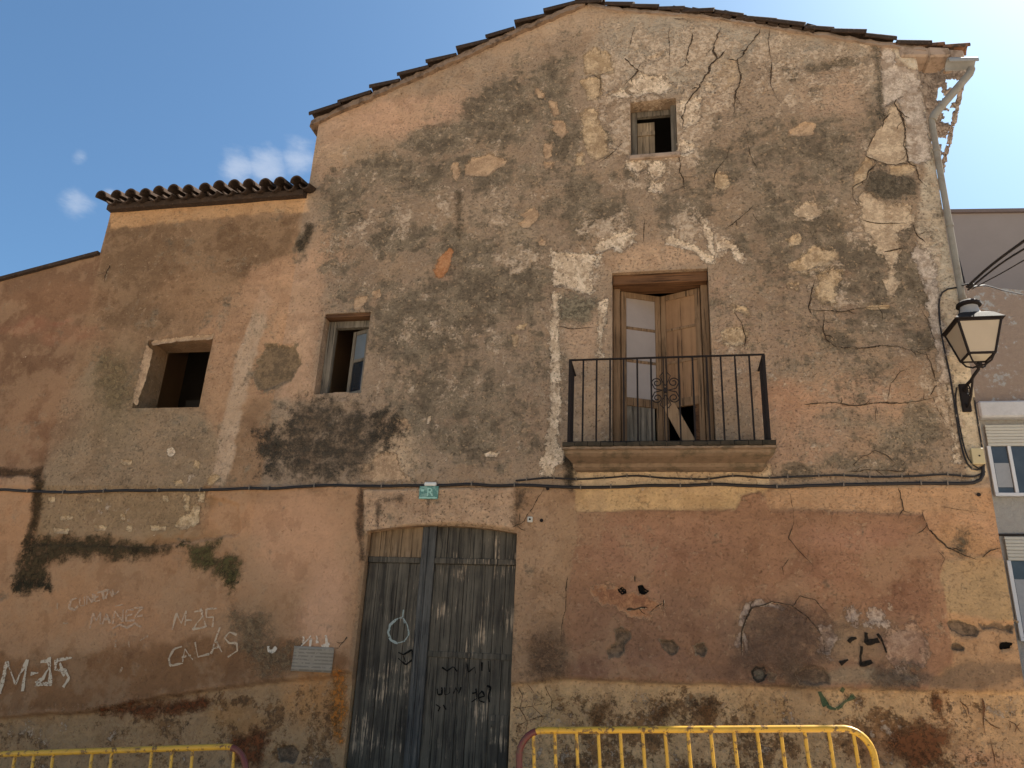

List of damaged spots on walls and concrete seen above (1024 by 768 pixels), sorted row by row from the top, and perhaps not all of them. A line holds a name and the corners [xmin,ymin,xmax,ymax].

peeling [535,46,717,169]
crack [668,18,781,191]
crack [852,97,927,252]
peeling [662,214,747,265]
peeling [853,47,965,466]
peeling [538,226,638,477]
crack [804,278,946,422]
mould [251,394,403,481]
damp [0,467,184,595]
crack [782,495,815,574]
crack [848,450,1000,566]
peeling [843,605,932,682]